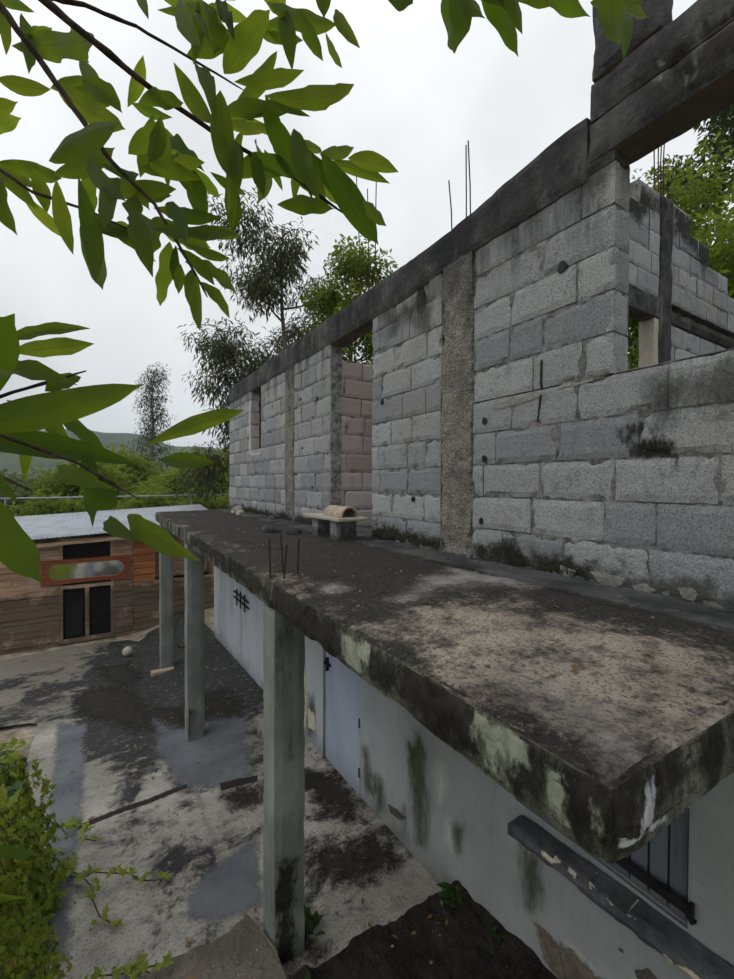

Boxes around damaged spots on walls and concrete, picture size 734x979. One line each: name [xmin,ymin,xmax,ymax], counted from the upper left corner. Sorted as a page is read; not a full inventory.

leakage [619,422,678,465]
leakage [367,646,485,756]
leakage [408,736,427,844]
leakage [497,700,734,851]
leakage [524,852,539,907]
peeling [541,851,577,879]
spalling [635,968,657,979]
peeling [663,953,701,979]